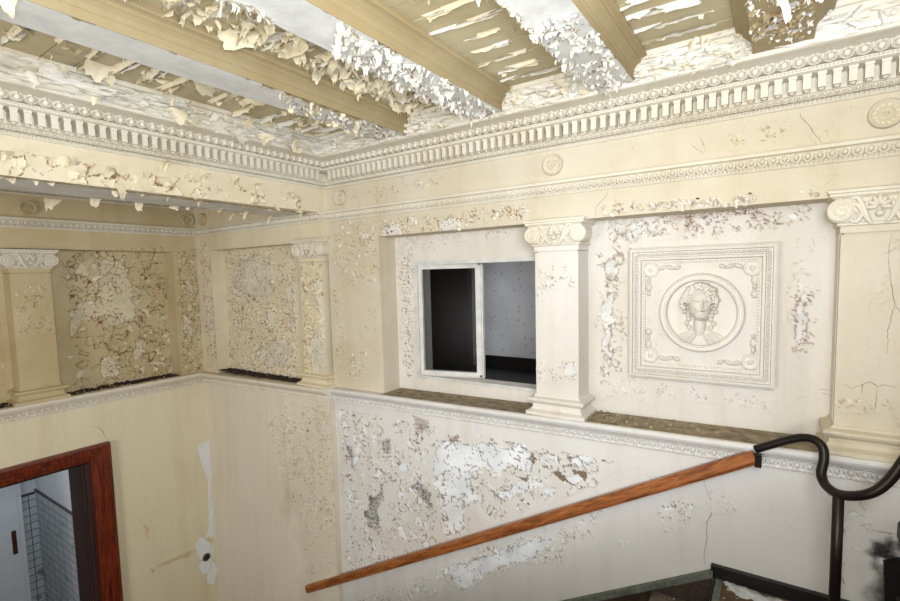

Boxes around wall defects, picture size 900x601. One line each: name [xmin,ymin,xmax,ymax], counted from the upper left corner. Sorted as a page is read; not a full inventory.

peeling [0,0,900,157]
peeling [0,149,306,225]
peeling [10,239,217,390]
peeling [224,245,327,378]
peeling [339,199,537,381]
peeling [594,187,826,388]
peeling [266,399,638,601]